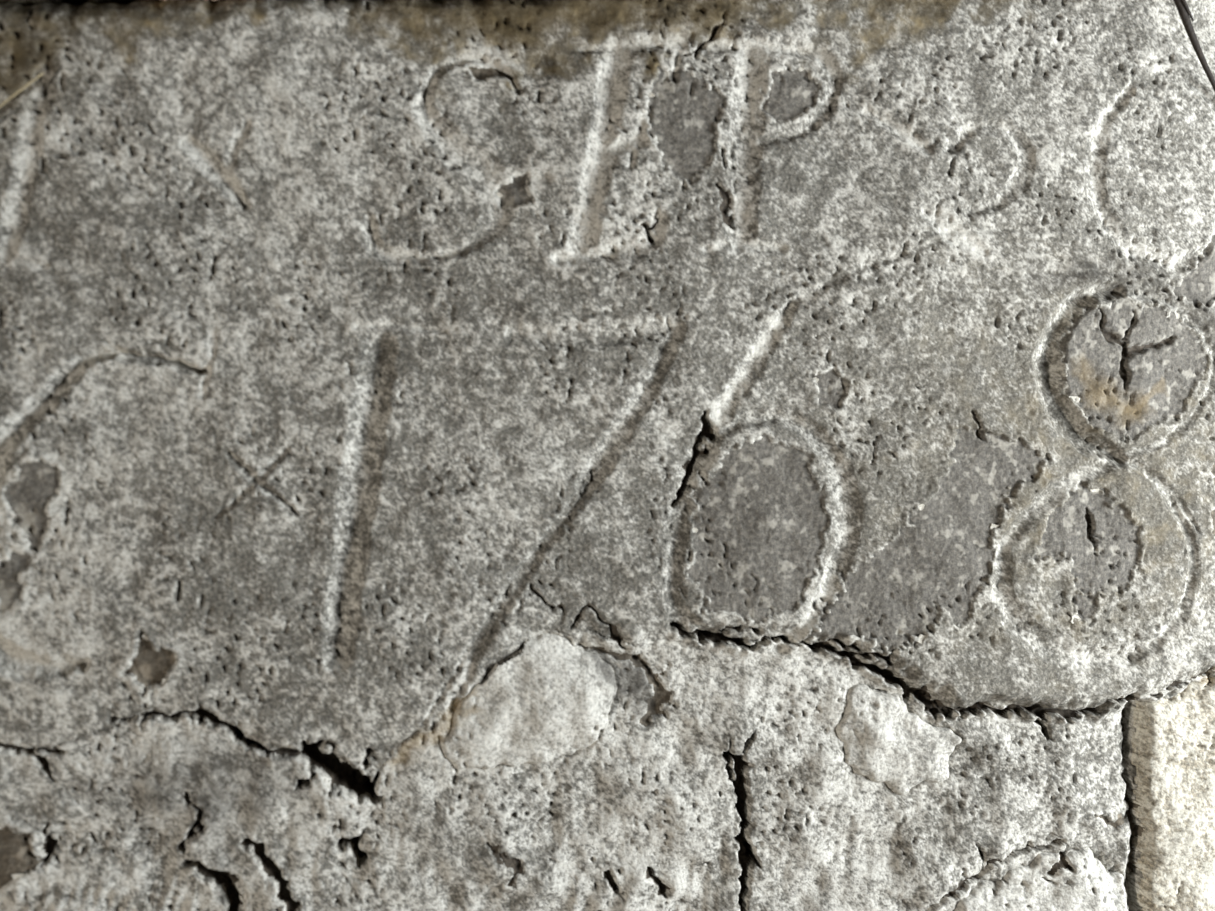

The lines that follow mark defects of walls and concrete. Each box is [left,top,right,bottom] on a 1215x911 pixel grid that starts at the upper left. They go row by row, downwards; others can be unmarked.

peeling [648,66,725,183]
peeling [763,67,819,122]
spalling [716,184,733,229]
peeling [1060,235,1215,440]
peeling [811,369,848,408]
crack [531,588,624,648]
crack [0,742,61,773]
crack [110,705,301,756]
crack [670,621,1215,872]
crack [722,735,757,911]
crack [932,838,1061,905]